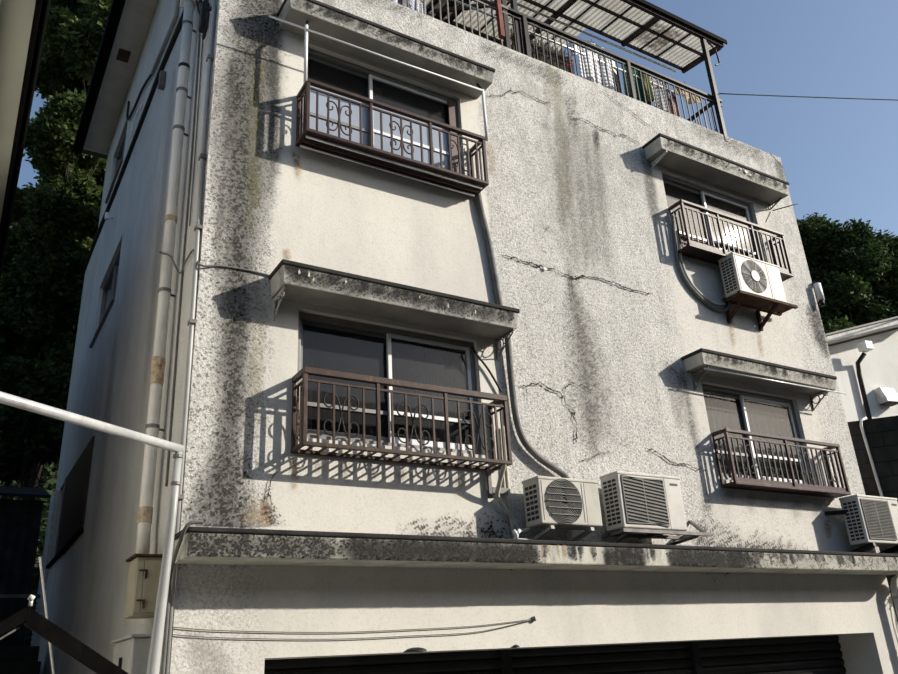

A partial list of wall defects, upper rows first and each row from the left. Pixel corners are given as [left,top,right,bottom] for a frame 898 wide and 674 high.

crack [573,94,651,149]
water stain [642,154,656,214]
water stain [187,0,547,570]
crack [498,254,652,299]
crack [520,381,707,471]
water stain [567,546,655,566]
water stain [667,480,897,582]